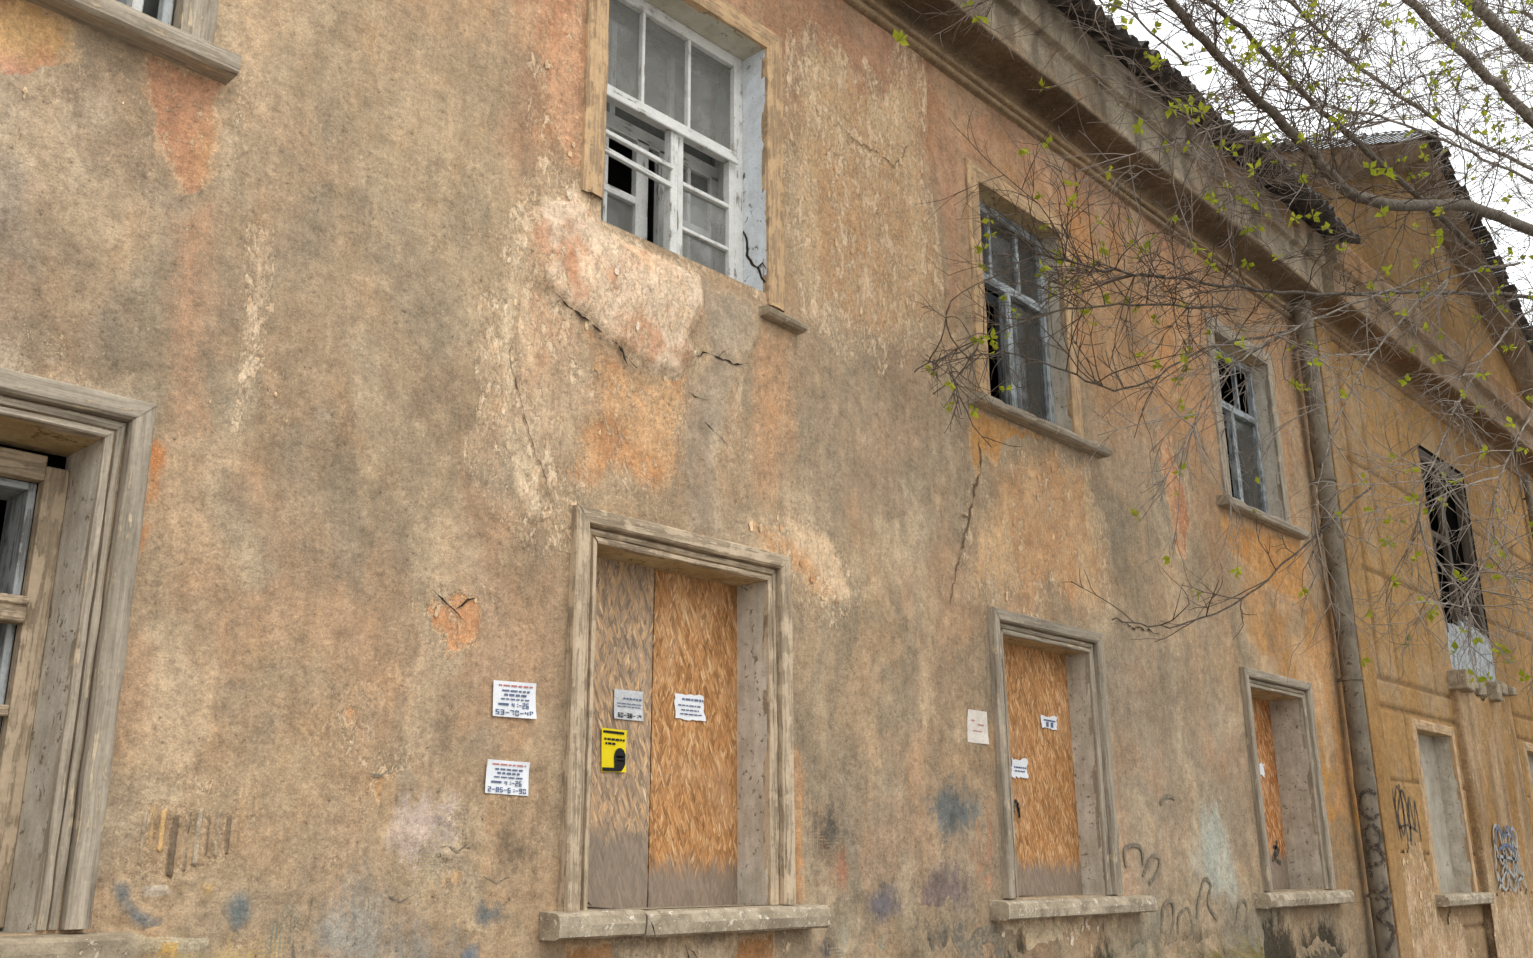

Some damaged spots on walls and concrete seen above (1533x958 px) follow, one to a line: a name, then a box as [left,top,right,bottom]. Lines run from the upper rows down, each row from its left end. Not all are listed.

peeling [0,0,241,197]
peeling [0,395,136,461]
peeling [0,307,157,435]
peeling [209,363,355,459]
crack [543,283,637,368]
peeling [463,0,973,619]
crack [950,420,982,606]